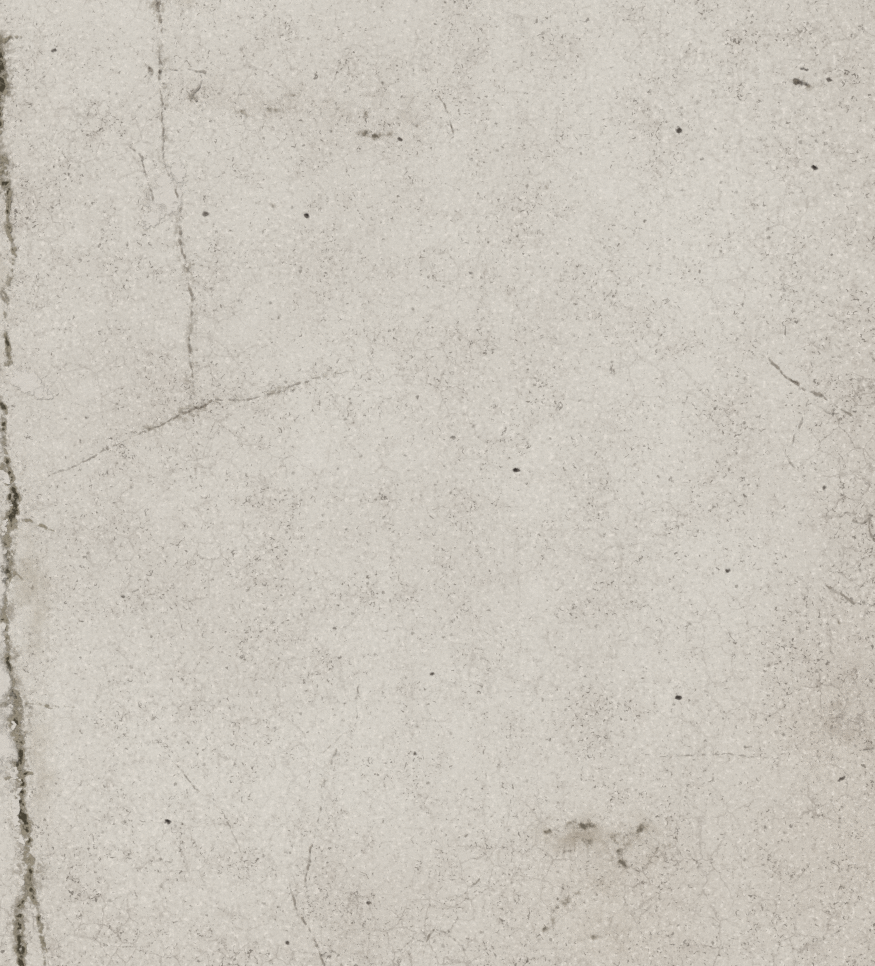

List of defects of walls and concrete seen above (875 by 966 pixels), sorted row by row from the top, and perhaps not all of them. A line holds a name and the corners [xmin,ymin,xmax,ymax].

crack [152,0,162,31]
crack [139,57,206,149]
crack [0,35,21,366]
crack [140,378,313,434]
crack [0,401,54,966]